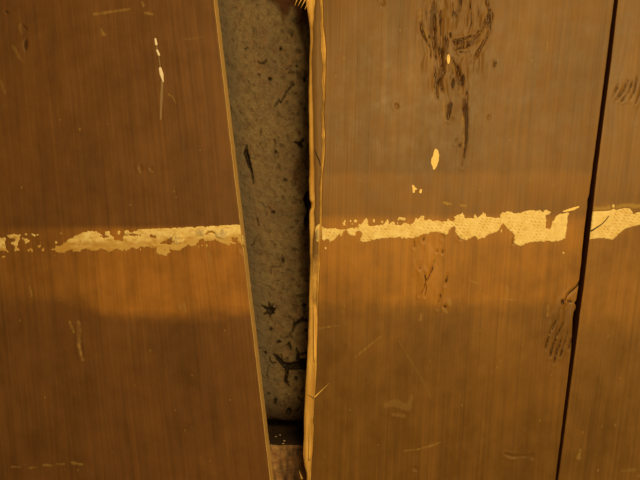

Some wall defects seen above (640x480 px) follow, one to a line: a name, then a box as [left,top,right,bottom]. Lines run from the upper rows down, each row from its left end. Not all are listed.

peeling [431,149,439,170]
peeling [303,191,579,249]
peeling [590,204,640,240]
peeling [0,225,245,258]